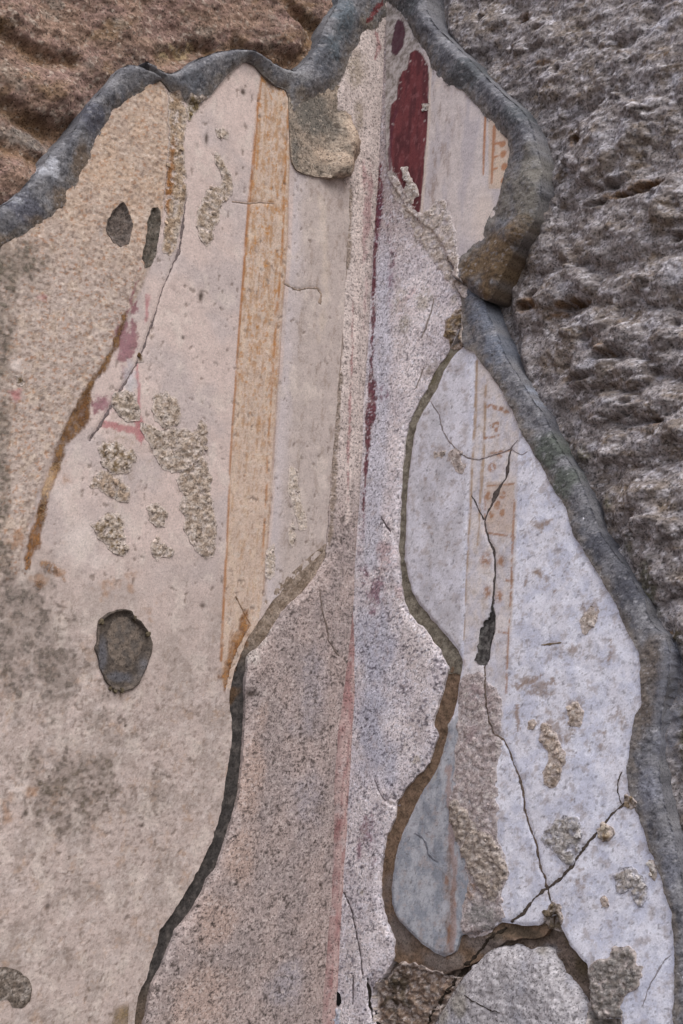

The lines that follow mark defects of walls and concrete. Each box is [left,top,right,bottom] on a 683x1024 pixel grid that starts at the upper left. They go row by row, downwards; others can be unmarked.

peeling [106,202,133,247]
spalling [389,166,468,350]
crack [421,298,435,338]
spalling [89,440,137,556]
spalling [111,390,218,562]
crack [414,368,527,604]
crack [415,833,438,862]
spalling [448,672,510,938]
crack [427,664,624,1024]
spalling [527,719,566,788]
spalling [372,961,463,1024]
spalling [586,946,643,1024]